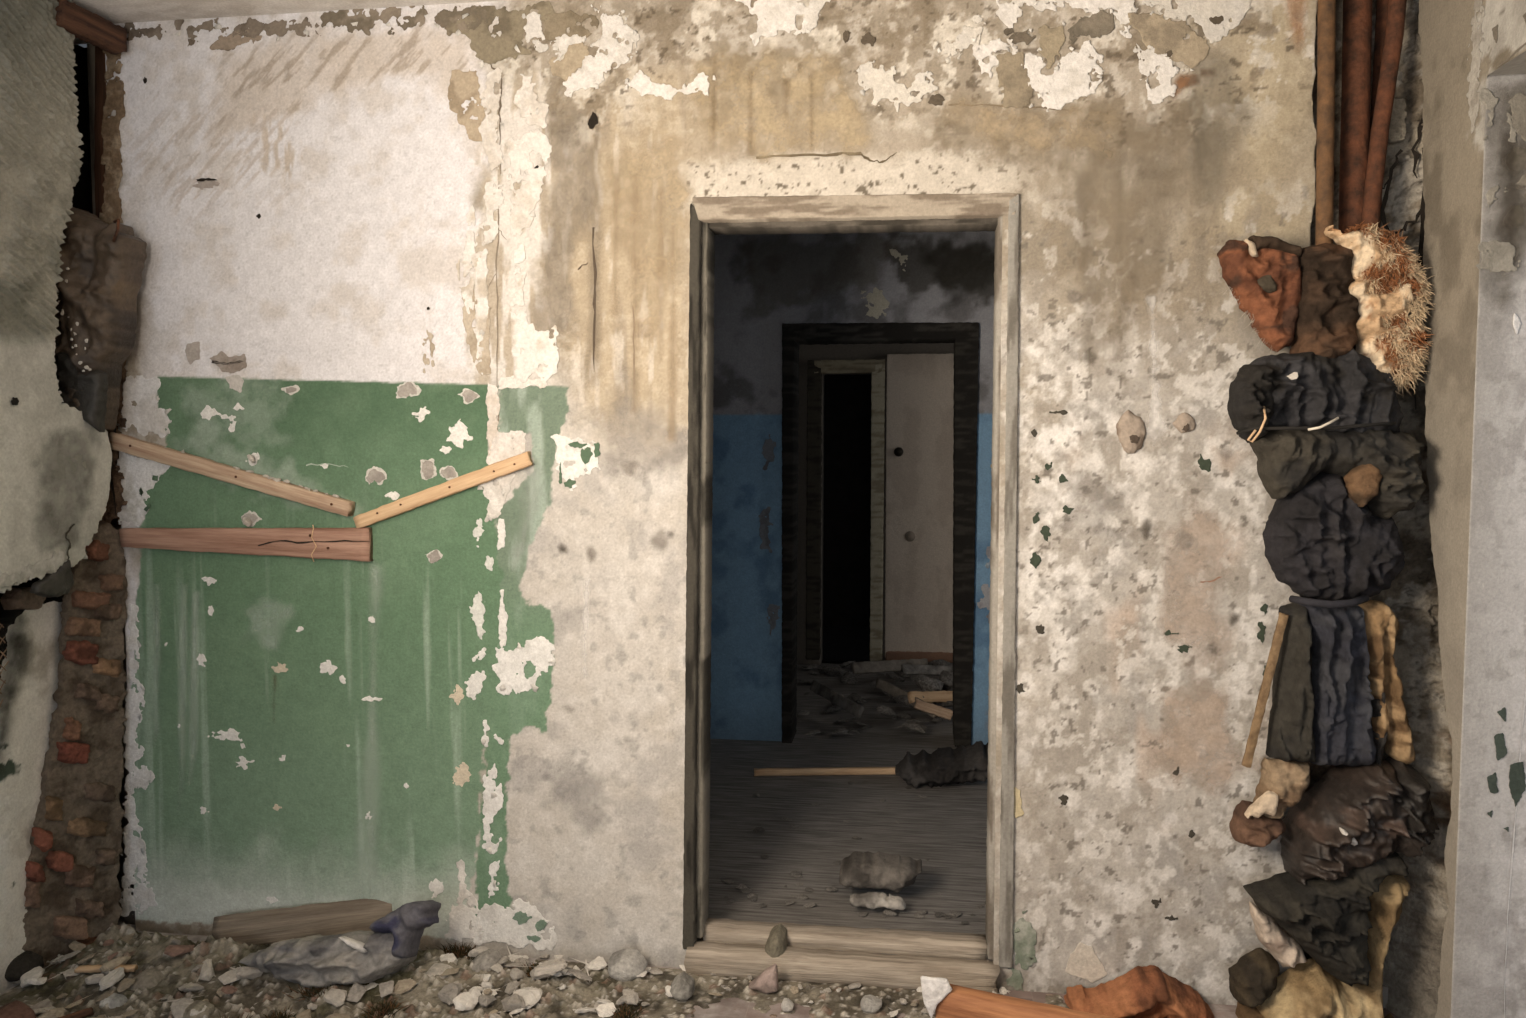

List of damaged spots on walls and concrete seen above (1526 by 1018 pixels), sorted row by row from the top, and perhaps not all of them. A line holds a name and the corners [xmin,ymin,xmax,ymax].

peeling [735,0,831,46]
peeling [843,0,1251,112]
peeling [99,1,716,571]
crack [1380,114,1427,410]
spalling [0,360,172,969]
peeling [271,662,288,673]
peeling [320,660,346,684]
peeling [449,589,556,705]
peeling [207,728,255,770]
peeling [429,720,558,951]